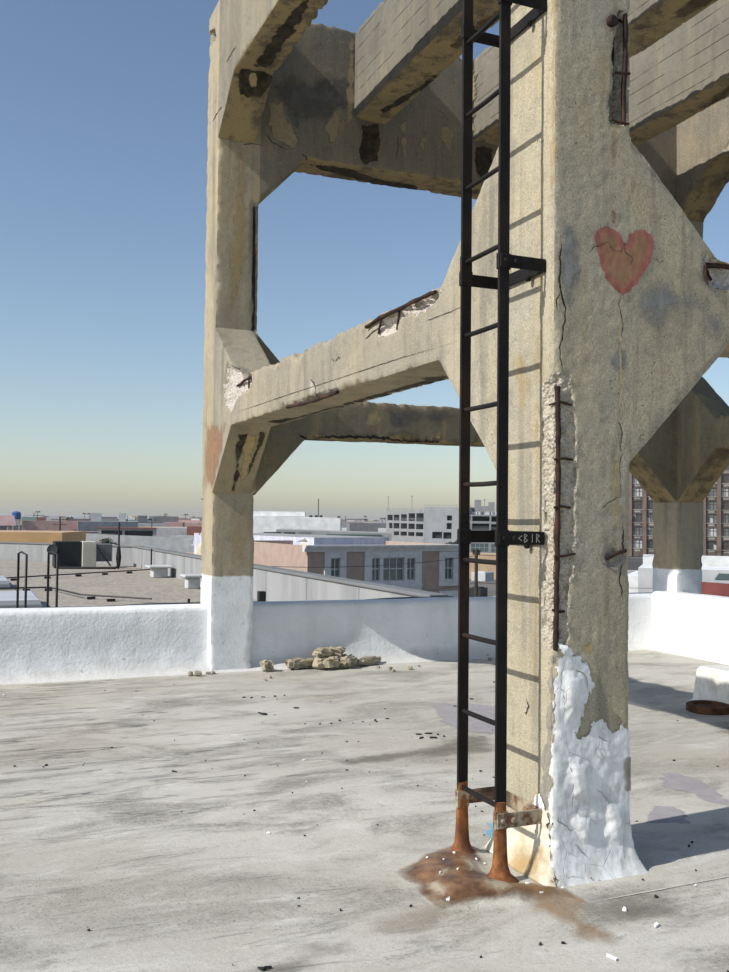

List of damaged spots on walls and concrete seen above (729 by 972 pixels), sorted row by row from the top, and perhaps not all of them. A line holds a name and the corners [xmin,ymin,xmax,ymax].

spalling [607,9,631,126]
spalling [365,289,441,338]
crack [556,243,566,366]
spalling [703,255,729,290]
spalling [223,362,253,412]
peeling [240,435,256,481]
crack [602,421,624,600]
peeling [507,370,649,888]
corrosion [406,846,580,918]